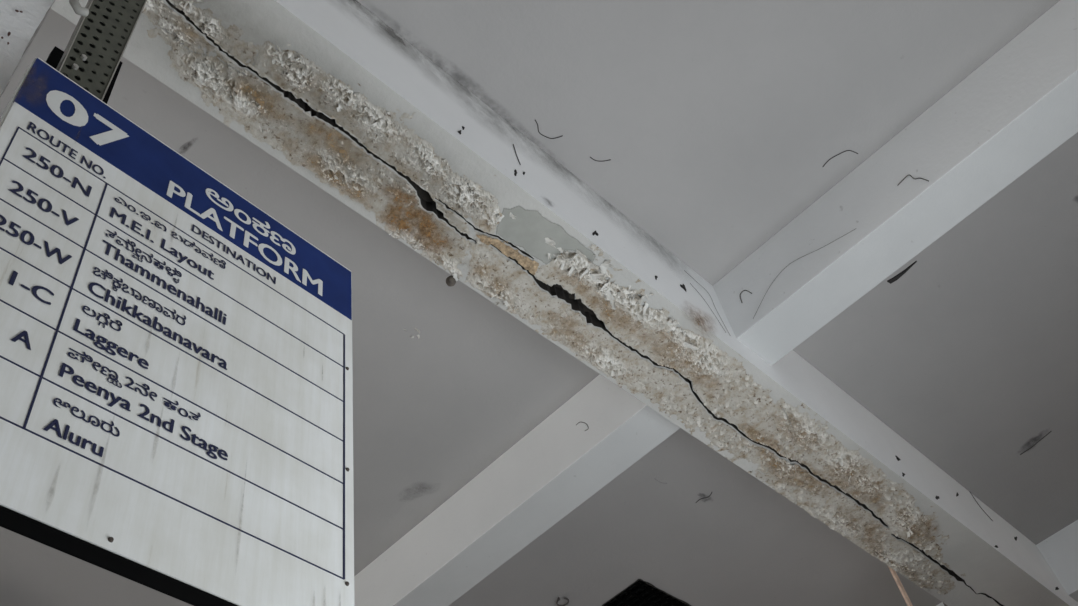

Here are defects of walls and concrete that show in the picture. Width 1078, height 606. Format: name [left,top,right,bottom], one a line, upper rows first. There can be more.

corrosion [387,190,447,250]
peeling [142,0,966,602]
crack [166,0,1004,606]